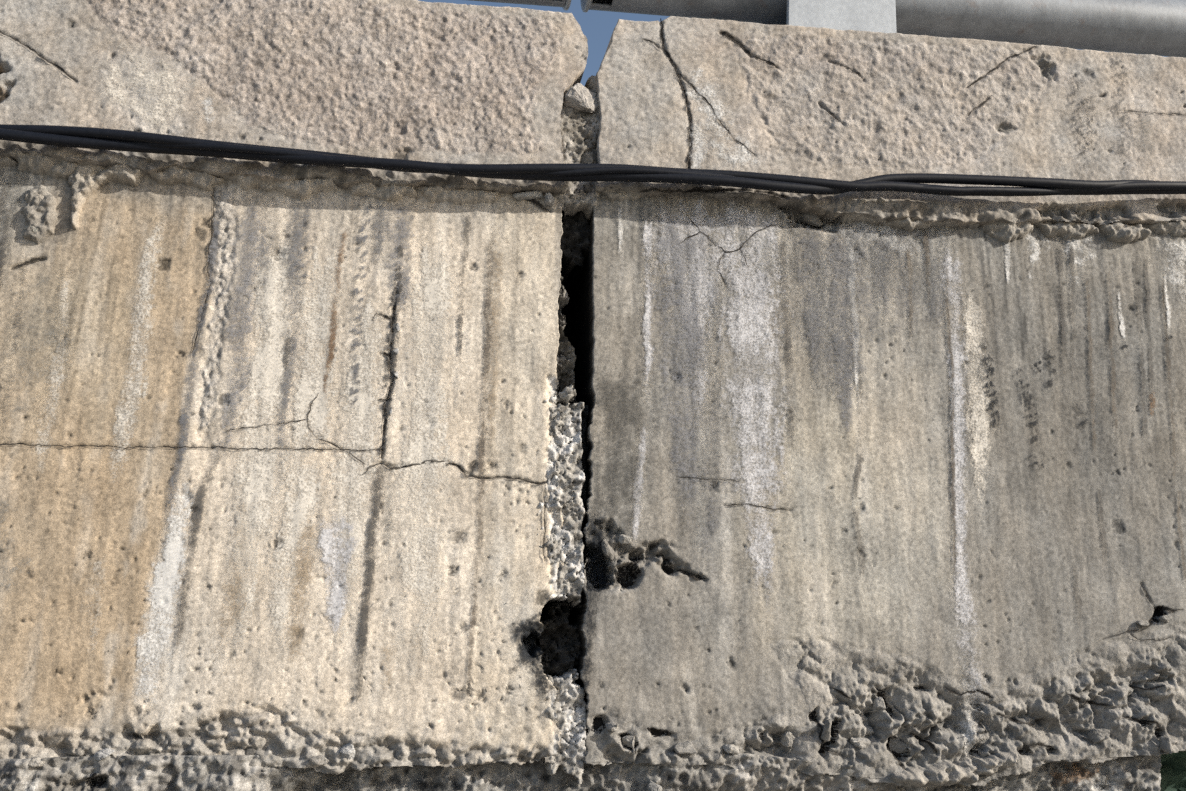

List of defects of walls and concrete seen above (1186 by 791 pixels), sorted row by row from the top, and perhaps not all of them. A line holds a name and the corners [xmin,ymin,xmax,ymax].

spalling [0,66,15,103]
crack [0,31,75,80]
crack [640,18,786,287]
water stain [136,195,472,702]
crack [227,246,557,561]
water stain [468,242,493,693]
water stain [583,199,1000,689]
spalling [0,687,561,791]
water stain [512,612,555,699]
spalling [585,523,705,593]
spalling [584,625,1186,787]
crack [1104,585,1182,641]